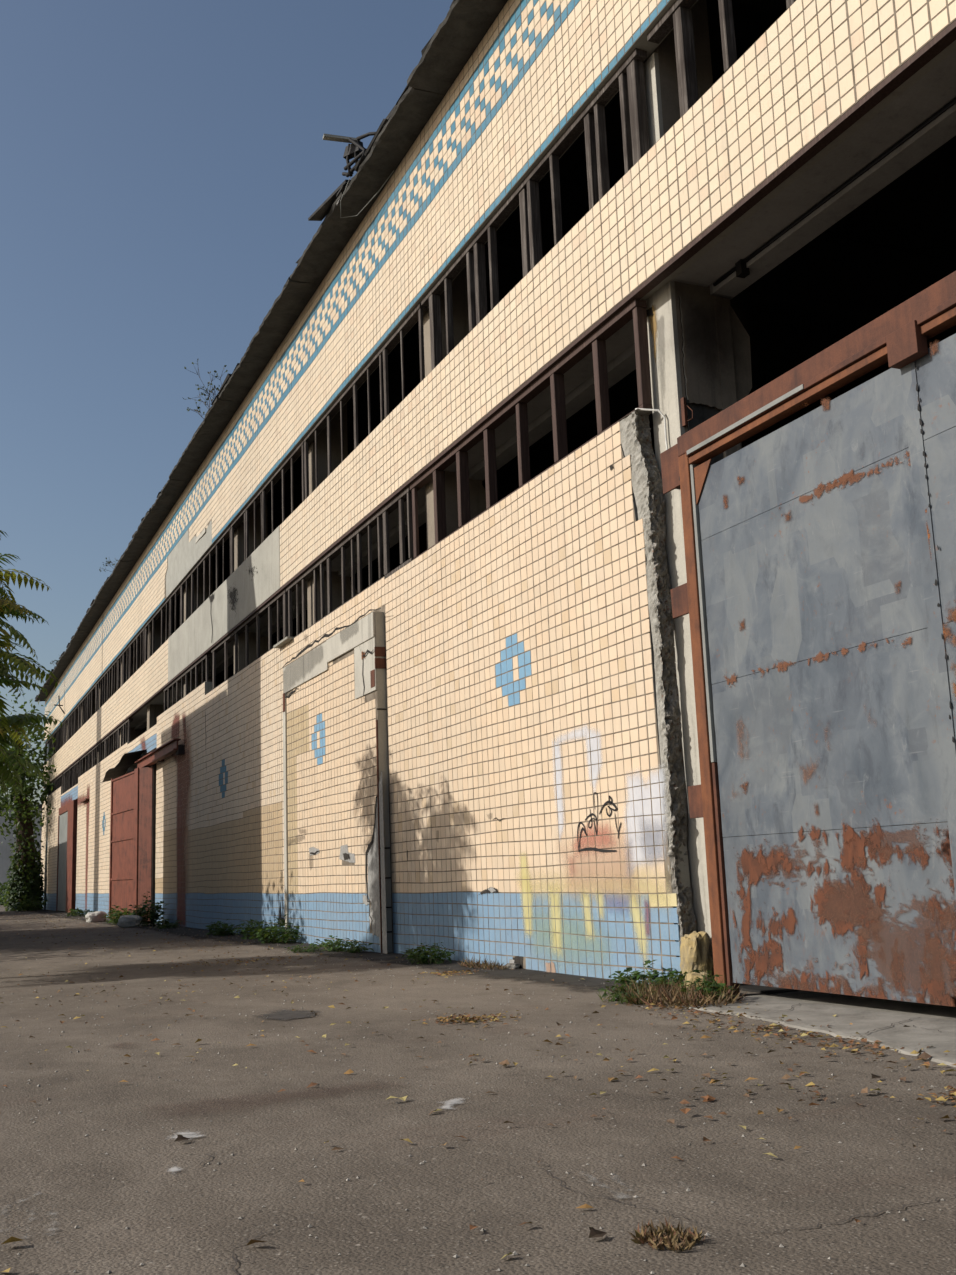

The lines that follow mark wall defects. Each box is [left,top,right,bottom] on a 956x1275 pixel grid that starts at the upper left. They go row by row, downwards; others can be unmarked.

corrosion [799,451,911,503]
spalling [618,409,697,957]
corrosion [943,608,956,646]
spalling [339,771,387,953]
corrosion [732,805,956,1007]